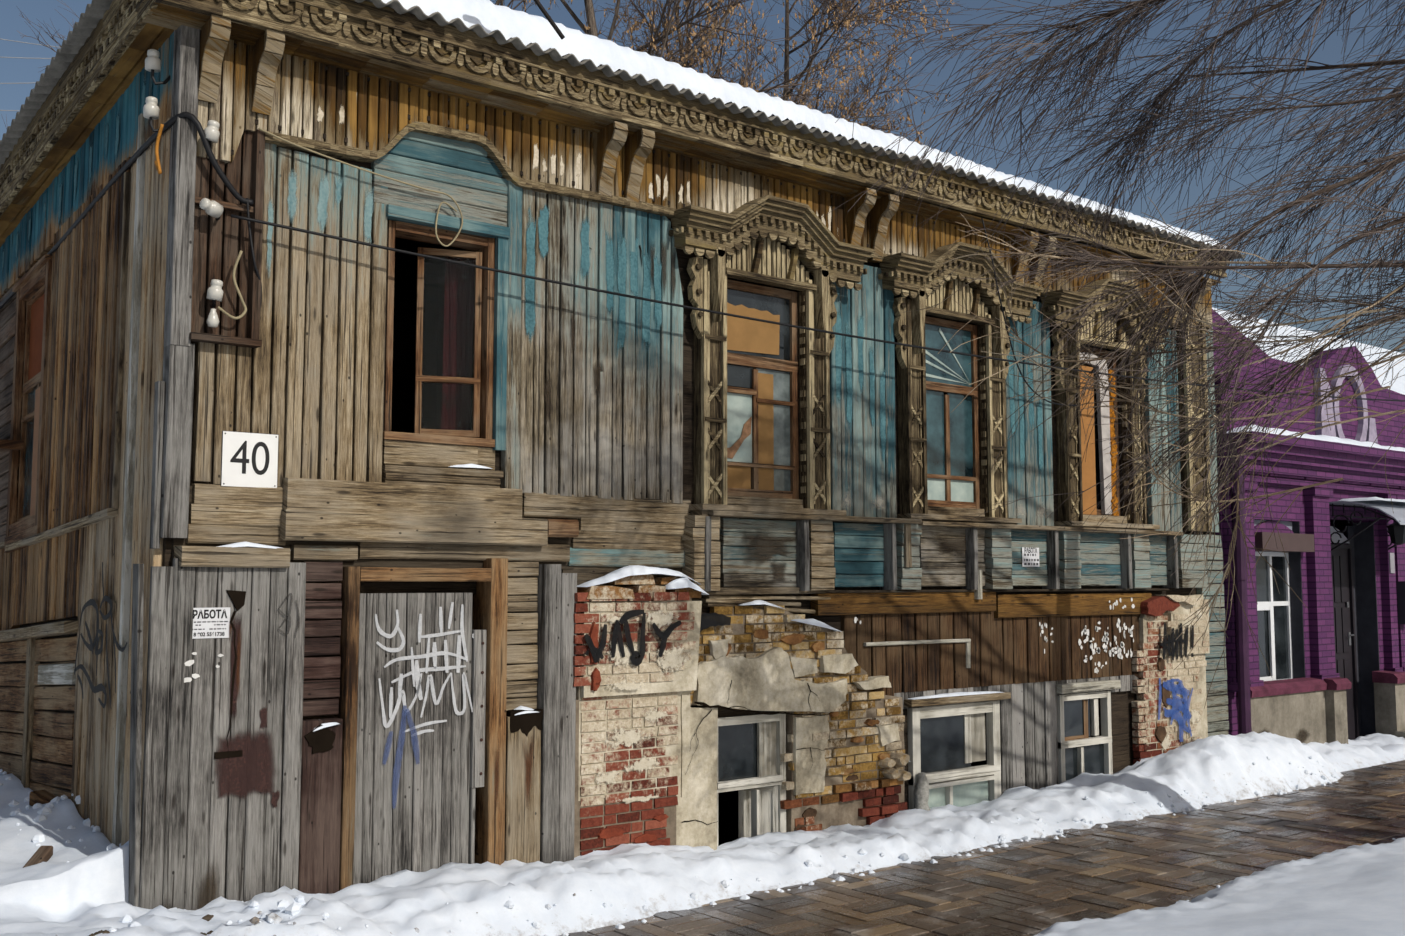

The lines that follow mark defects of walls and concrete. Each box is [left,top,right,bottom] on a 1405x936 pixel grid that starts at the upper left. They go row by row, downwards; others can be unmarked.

peeling [533,144,581,176]
peeling [649,174,691,204]
peeling [525,205,549,339]
peeling [580,218,662,355]
peeling [835,312,886,459]
peeling [646,610,679,629]
peeling [588,616,644,691]
peeling [654,646,689,673]
spalling [1157,658,1171,708]
peeling [596,709,668,784]
spalling [1154,726,1171,751]
spalling [598,794,669,843]